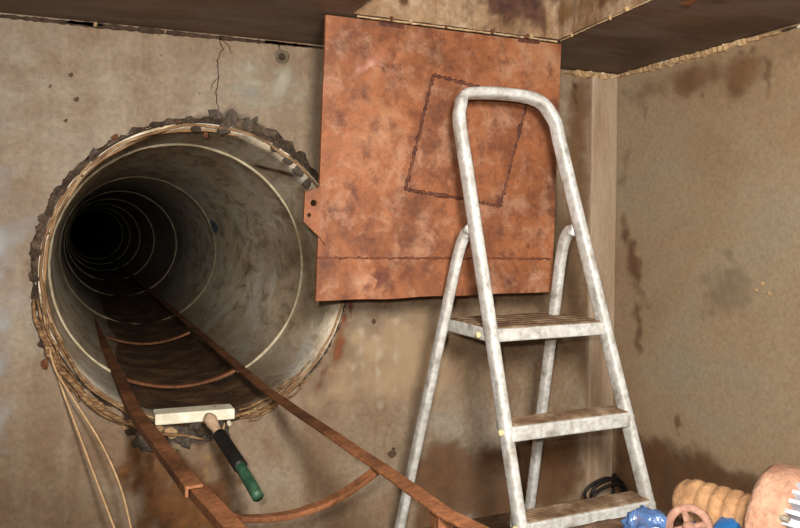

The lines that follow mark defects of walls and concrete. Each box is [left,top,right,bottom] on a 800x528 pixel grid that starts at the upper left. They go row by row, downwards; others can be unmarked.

spalling [357,0,651,42]
damp [488,0,545,27]
crack [0,14,323,110]